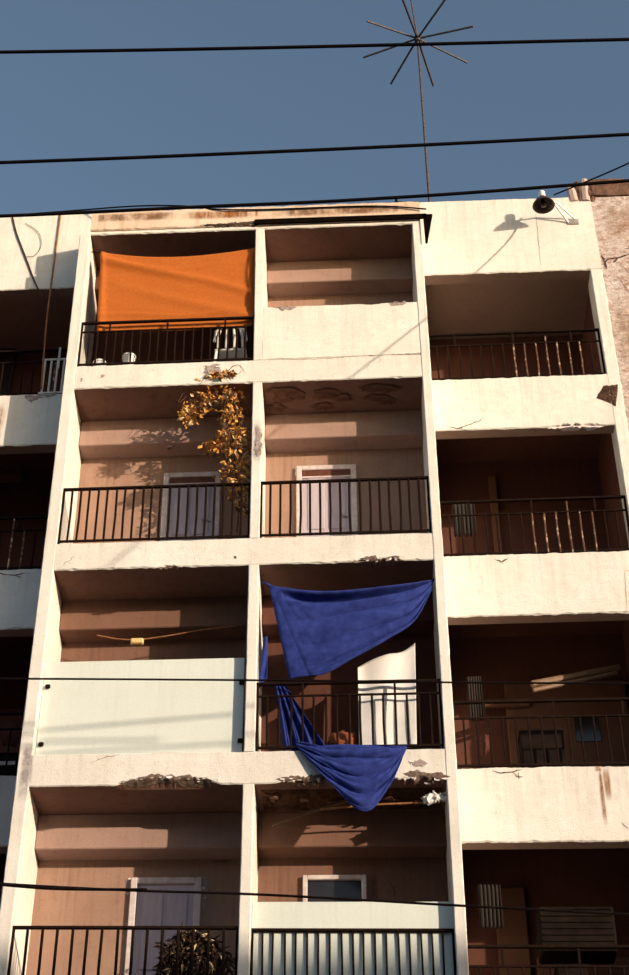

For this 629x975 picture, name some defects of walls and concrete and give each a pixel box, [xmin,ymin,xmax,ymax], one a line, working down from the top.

spalling [596,384,618,407]
spalling [119,774,217,789]
spalling [376,759,450,806]